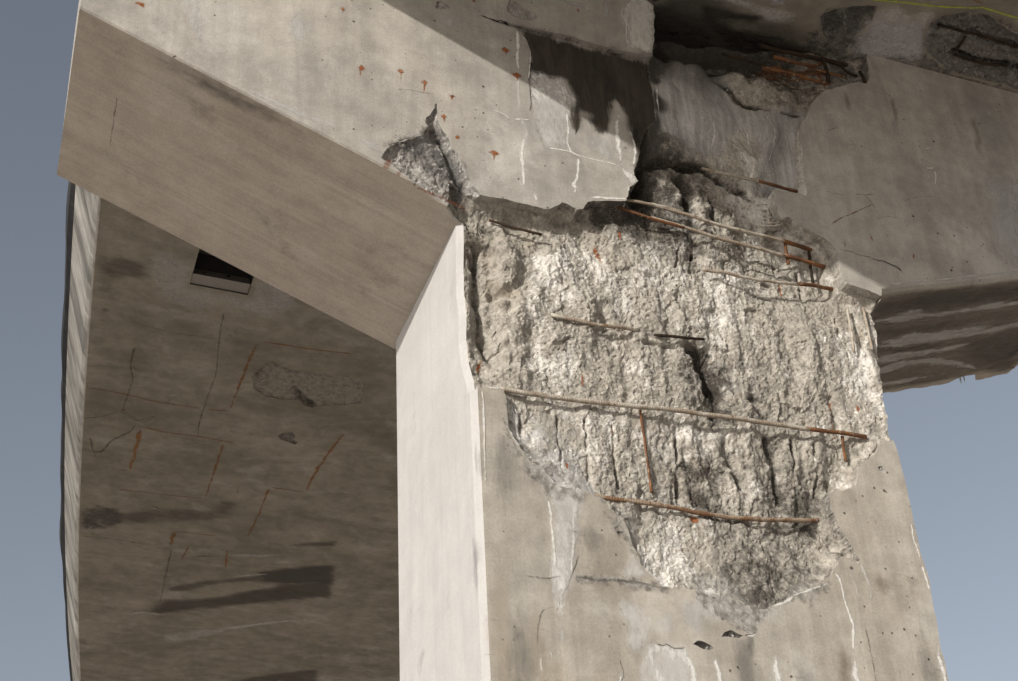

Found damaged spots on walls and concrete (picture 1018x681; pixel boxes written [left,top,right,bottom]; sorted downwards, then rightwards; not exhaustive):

leakage [515,0,821,207]
spalling [923,13,1018,90]
spalling [381,5,891,610]
leakage [874,271,1018,390]
leakage [611,505,642,575]
leakage [647,645,696,681]